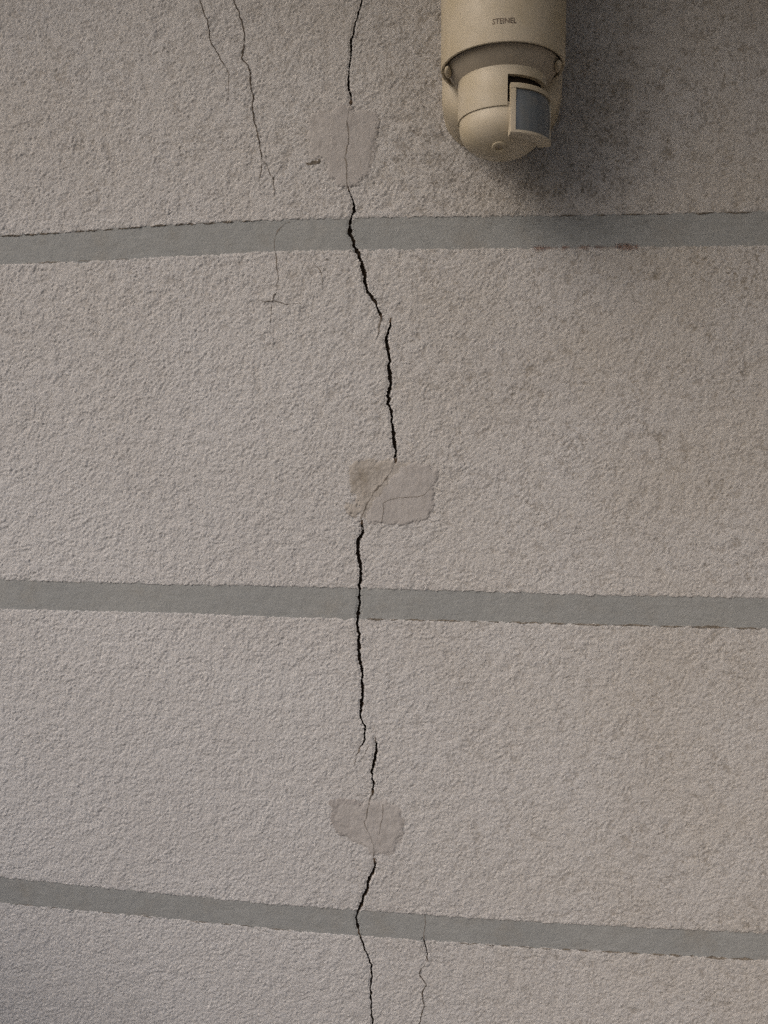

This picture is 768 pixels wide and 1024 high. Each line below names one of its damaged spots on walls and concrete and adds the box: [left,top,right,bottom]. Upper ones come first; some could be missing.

crack [200,0,291,197]
crack [257,221,297,324]
crack [344,0,427,1024]